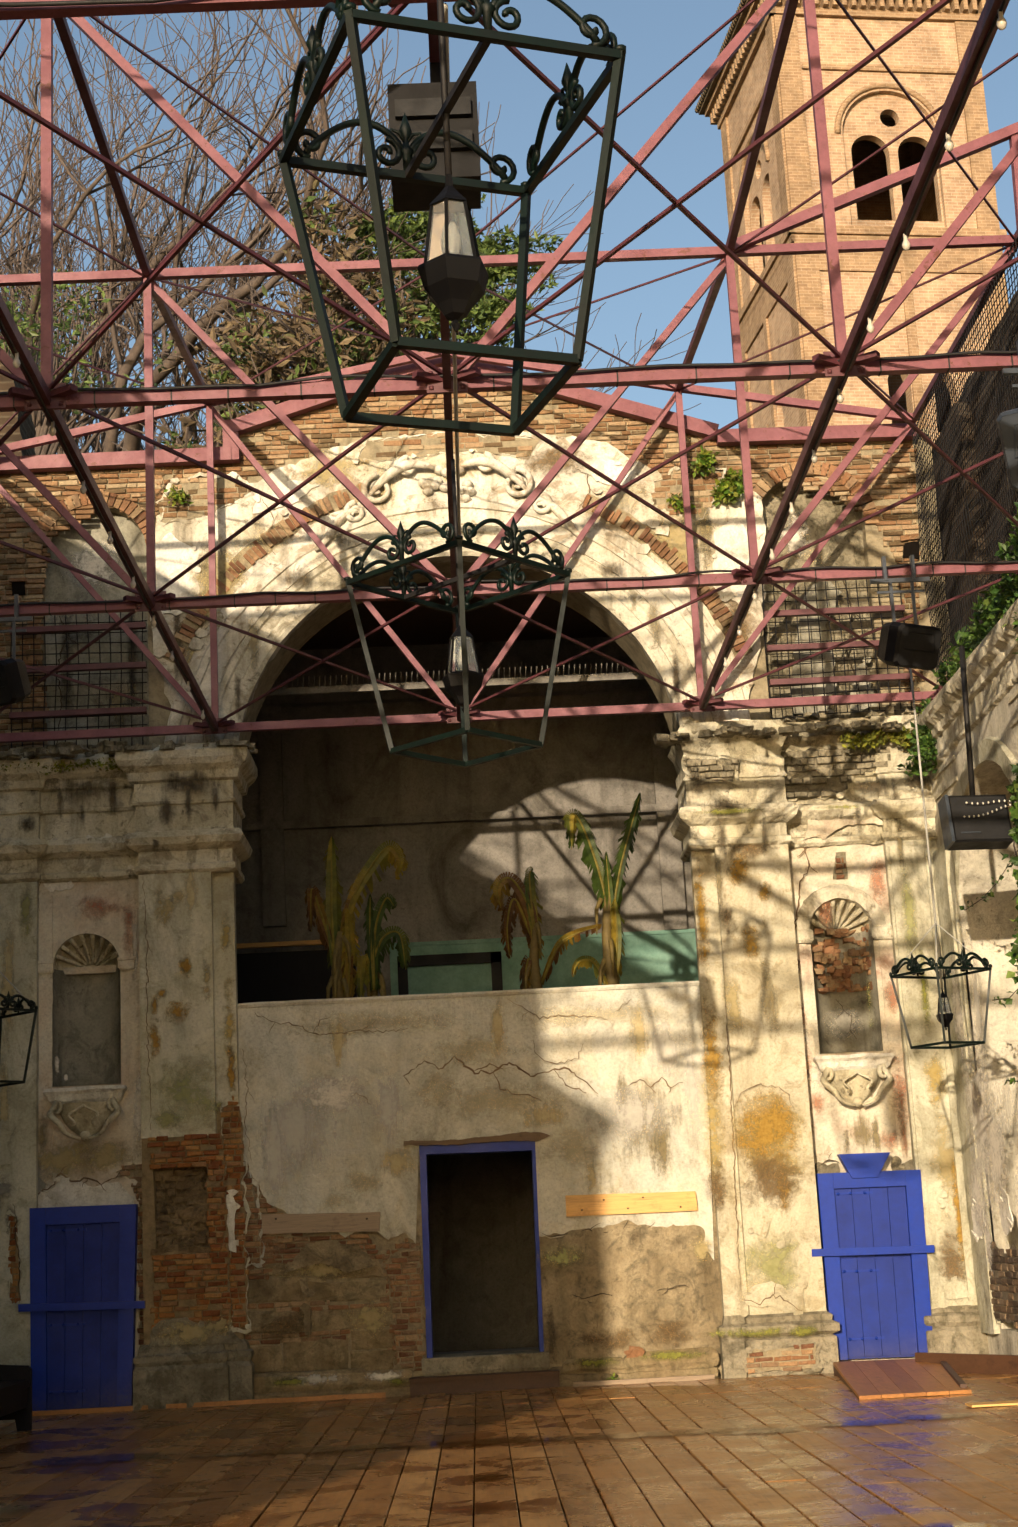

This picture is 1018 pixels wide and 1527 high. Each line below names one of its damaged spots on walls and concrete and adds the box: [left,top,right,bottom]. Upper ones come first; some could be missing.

spalling [653,581,903,801]
flaking render [804,817,883,879]
spalling [811,924,873,994]
crack [242,999,683,1158]
leakage [633,975,800,1208]
flaking render [949,956,1018,1329]
spalling [0,1210,25,1308]
spalling [38,1091,265,1355]
spalling [382,1244,426,1371]
flaking render [944,1276,972,1299]